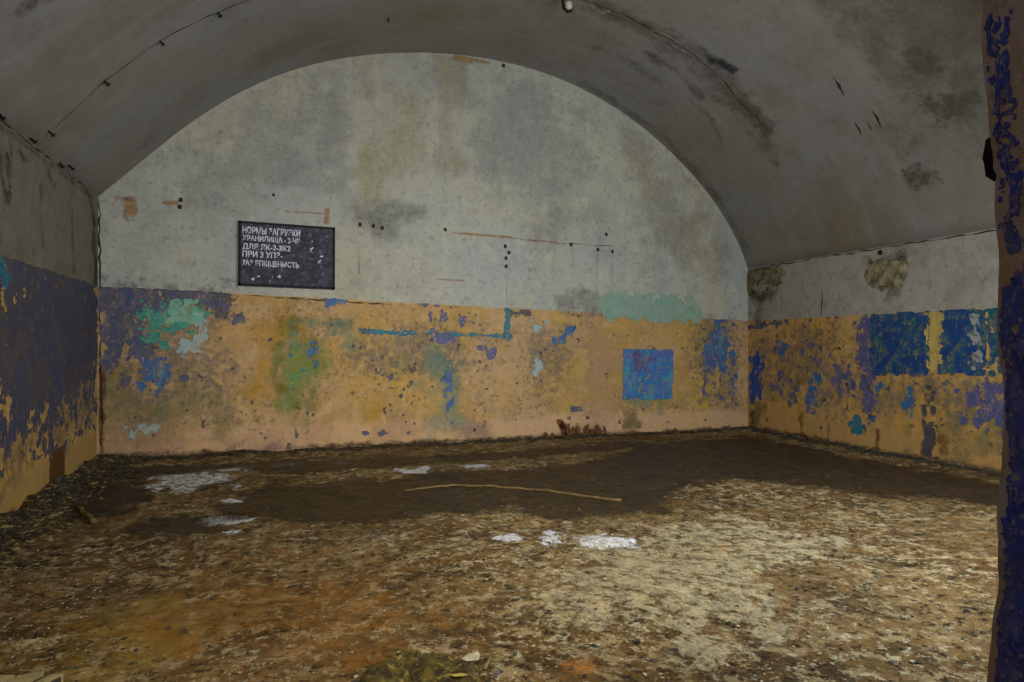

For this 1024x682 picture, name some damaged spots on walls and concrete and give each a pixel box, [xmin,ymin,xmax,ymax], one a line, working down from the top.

peeling [983,0,1020,146]
peeling [0,255,238,478]
peeling [372,355,452,435]
peeling [421,303,513,349]
peeling [509,309,588,355]
peeling [681,315,895,435]